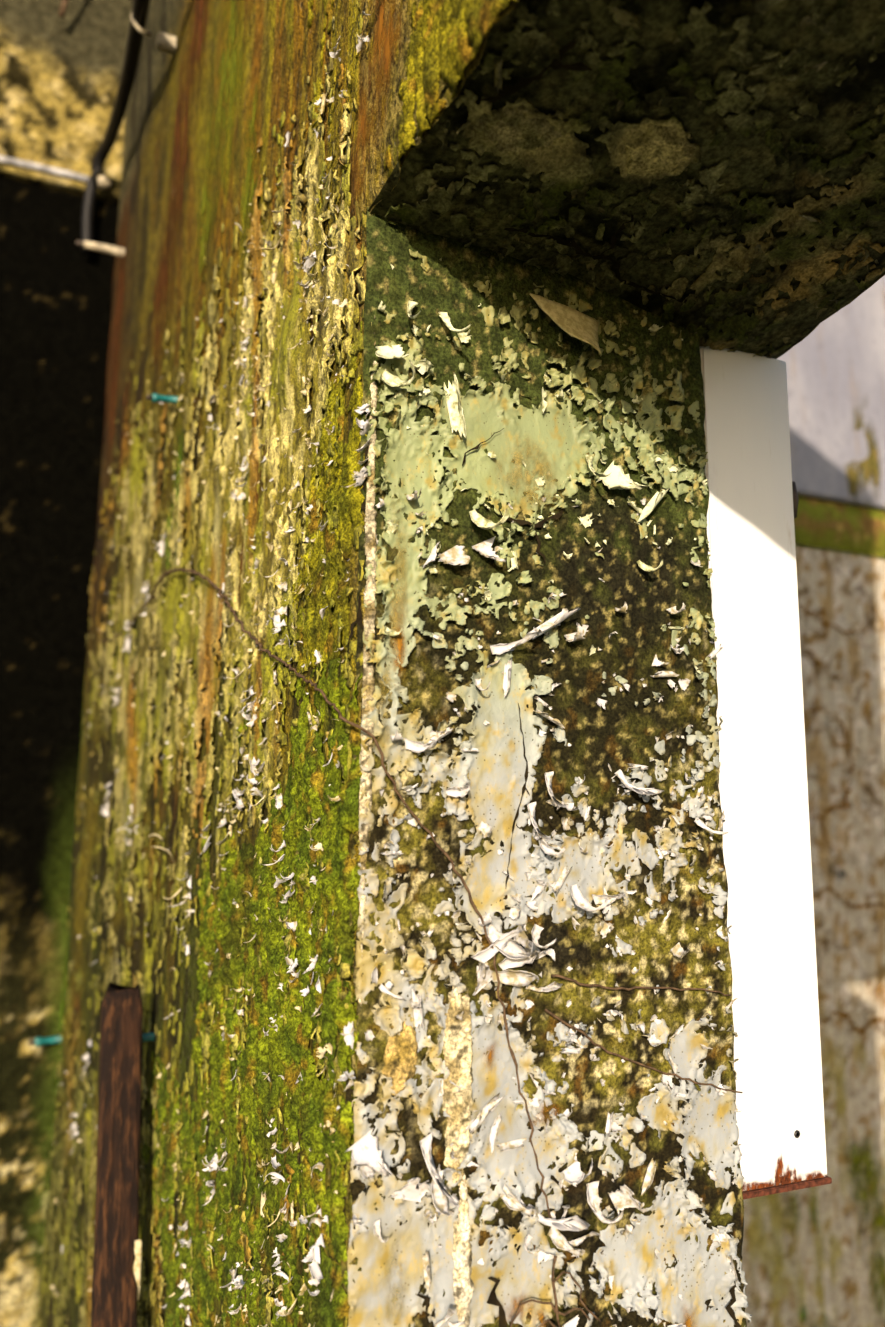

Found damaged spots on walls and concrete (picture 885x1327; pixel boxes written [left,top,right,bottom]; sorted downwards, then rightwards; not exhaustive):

peeling [326,34,370,75]
corrosion [374,0,394,84]
spalling [623,123,695,174]
leakage [255,436,270,534]
peeling [99,89,357,1037]
peeling [160,248,746,1327]
peeling [53,1040,93,1173]
corrosion [742,1157,825,1192]